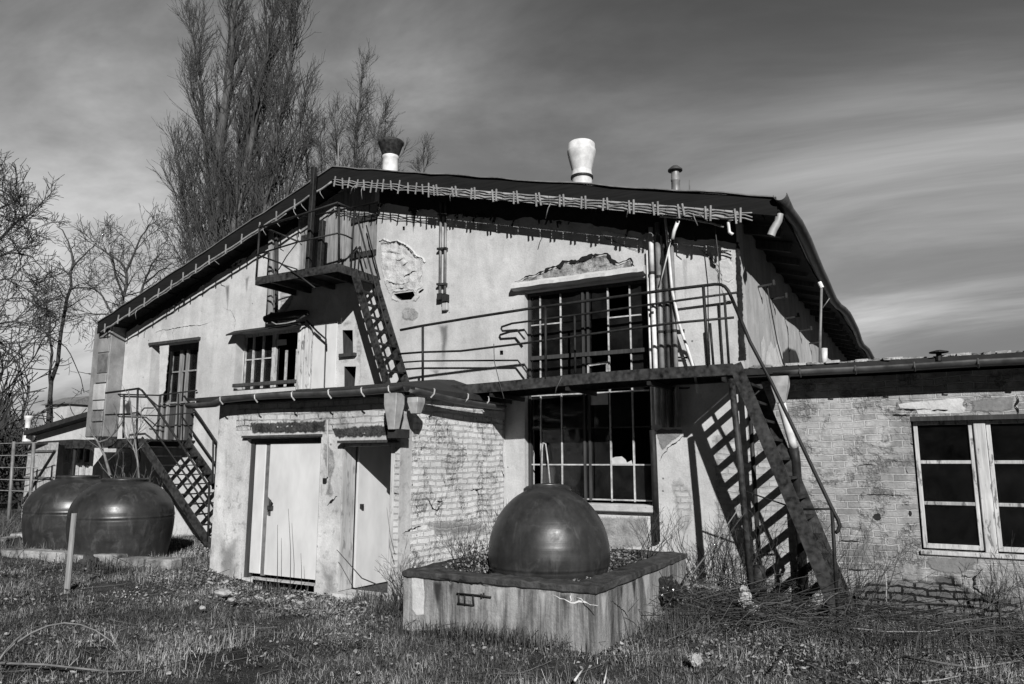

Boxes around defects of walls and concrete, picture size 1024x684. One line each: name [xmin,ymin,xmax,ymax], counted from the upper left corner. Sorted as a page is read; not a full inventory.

spalling [379,238,426,301]
spalling [515,231,643,282]
spalling [886,398,965,416]
peeling [657,429,683,458]
flaking render [428,522,486,537]